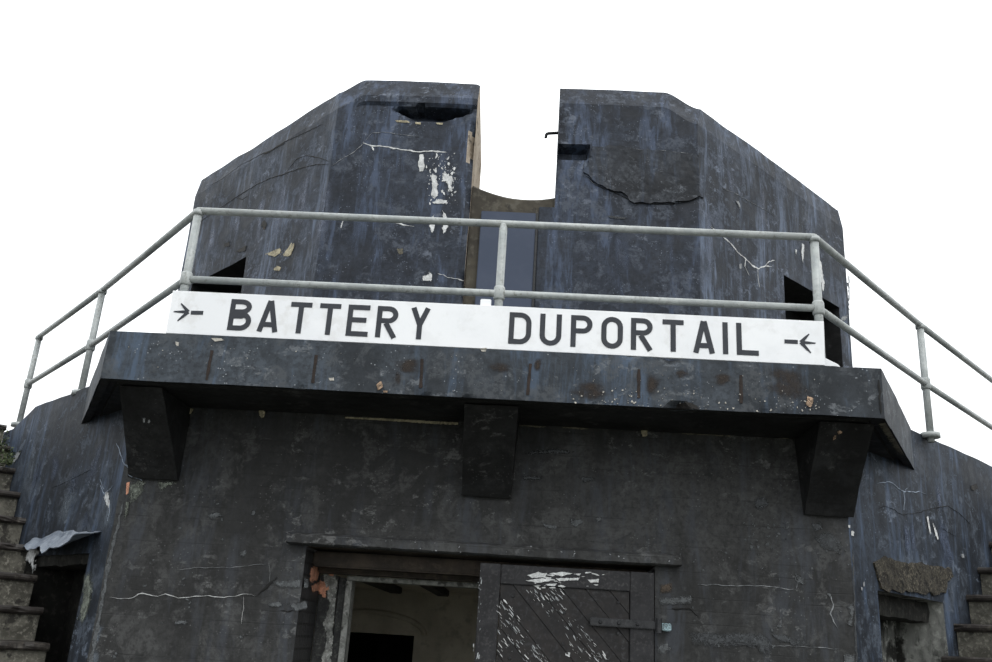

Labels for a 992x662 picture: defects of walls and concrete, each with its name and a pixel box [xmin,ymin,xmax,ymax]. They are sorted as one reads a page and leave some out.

crack [202,126,445,221]
peeling [418,153,467,234]
crack [583,147,702,205]
crack [710,226,775,287]
peeling [23,530,101,574]
peeling [77,481,145,662]
crack [113,564,277,623]
peeling [269,566,337,662]
peeling [497,599,548,662]
peeling [526,572,606,662]
crack [701,578,797,590]